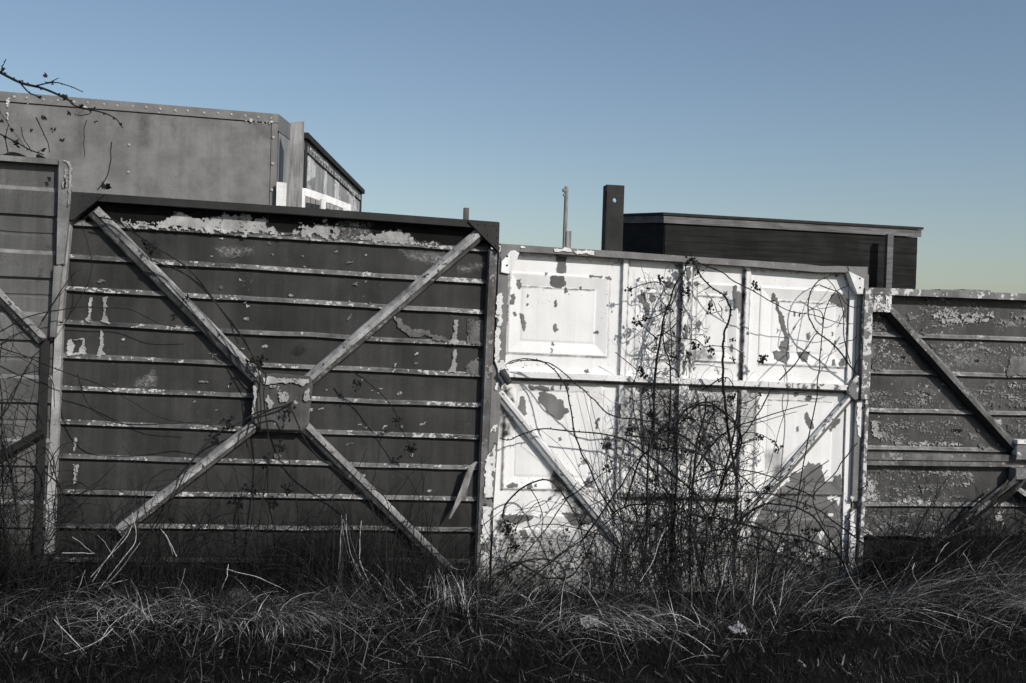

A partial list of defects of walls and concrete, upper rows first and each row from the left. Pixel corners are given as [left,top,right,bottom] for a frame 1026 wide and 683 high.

peeling [121,212,438,252]
peeling [66,296,110,356]
peeling [394,279,529,376]
peeling [545,247,612,307]
peeling [637,277,656,315]
peeling [771,293,849,366]
peeling [931,310,994,325]
peeling [252,376,324,416]
peeling [518,383,570,420]
peeling [829,400,962,447]
peeling [930,343,1026,425]
peeling [744,461,974,594]